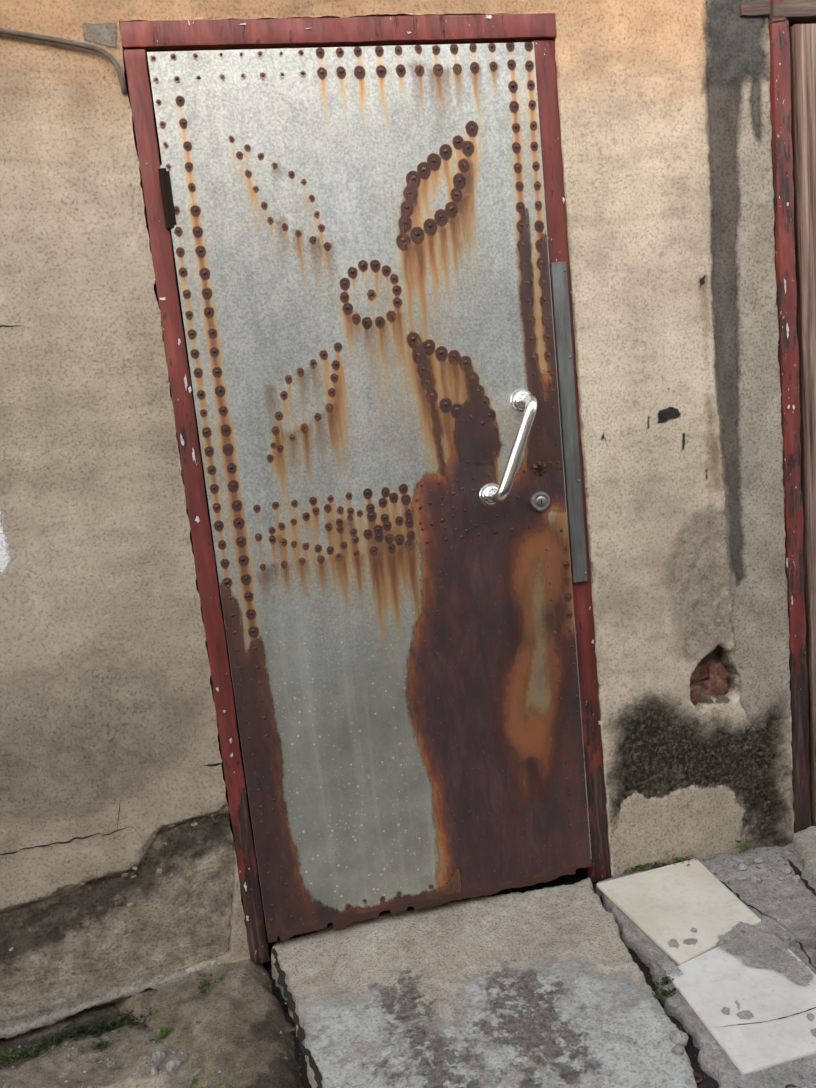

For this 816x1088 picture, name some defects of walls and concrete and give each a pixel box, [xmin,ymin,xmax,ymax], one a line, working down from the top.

rust [399,179,418,247]
rust [220,208,591,934]
flaking render [669,505,740,706]
crack [0,804,141,855]
leakage [606,696,793,848]